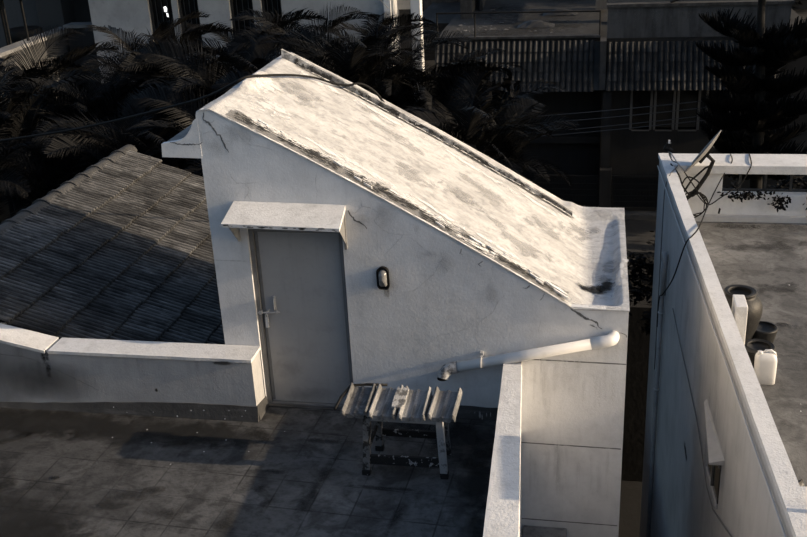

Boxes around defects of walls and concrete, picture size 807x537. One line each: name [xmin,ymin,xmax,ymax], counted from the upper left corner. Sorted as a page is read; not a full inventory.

crack [170,113,244,152]
peeling [213,58,615,319]
crack [348,199,483,293]
peeling [612,258,628,297]
leakage [0,412,258,445]